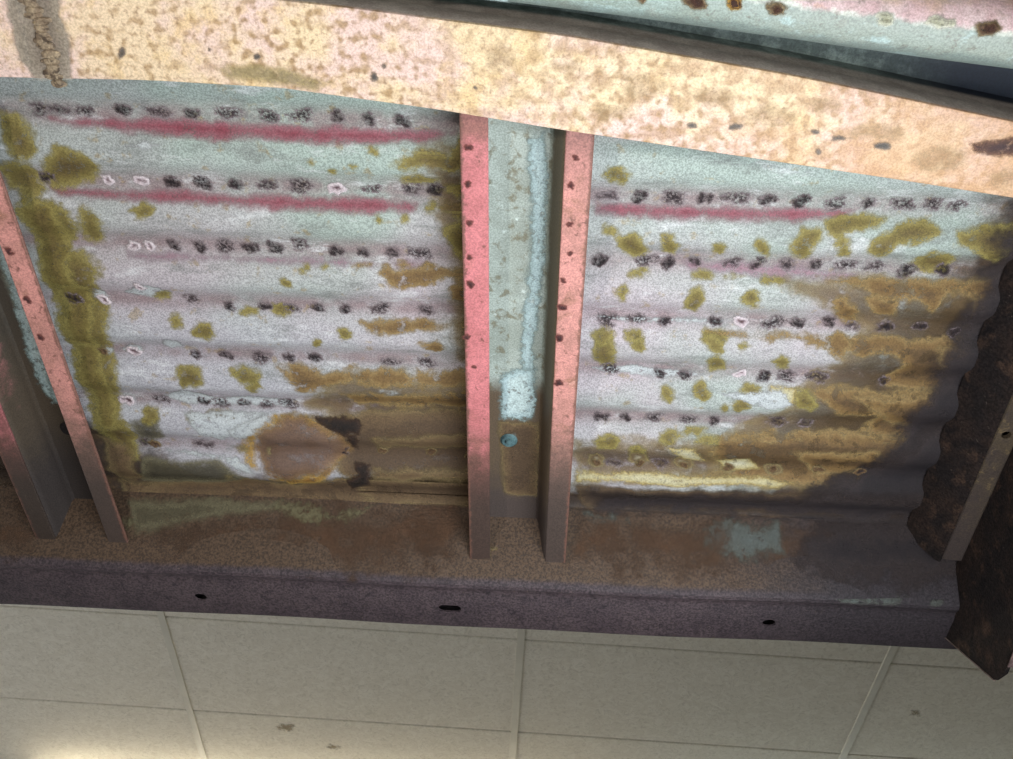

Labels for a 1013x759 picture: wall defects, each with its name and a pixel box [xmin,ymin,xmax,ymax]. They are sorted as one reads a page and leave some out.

corrosion [682,0,708,10]
corrosion [727,0,742,11]
corrosion [766,2,787,16]
corrosion [876,12,894,26]
corrosion [975,20,1002,37]
corrosion [972,137,1013,156]